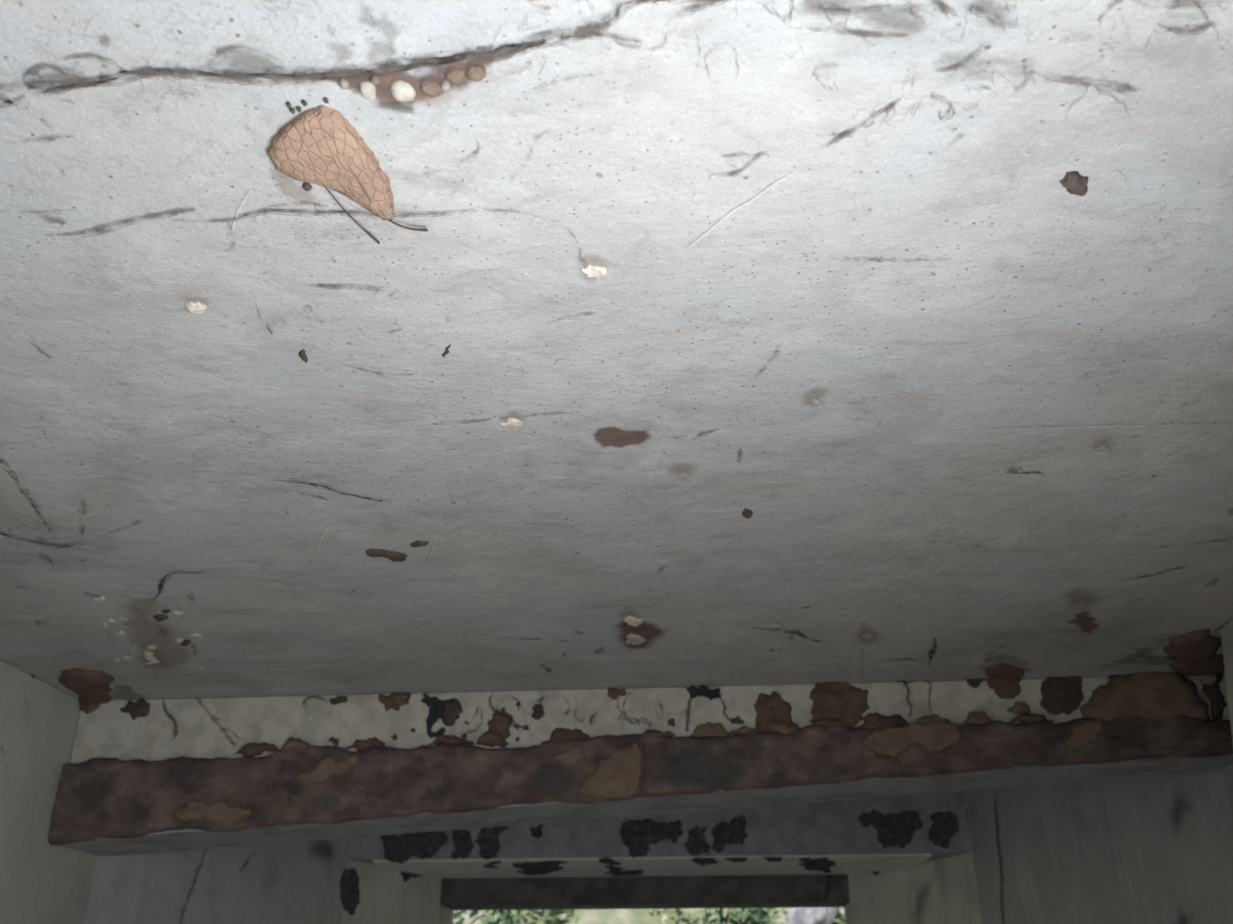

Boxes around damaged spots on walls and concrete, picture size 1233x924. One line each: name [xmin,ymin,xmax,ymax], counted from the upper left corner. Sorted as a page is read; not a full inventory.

rust [595,428,649,448]
spalling [620,616,661,649]
peeling [328,692,469,751]
spalling [487,702,544,742]
spalling [541,727,591,744]
spalling [667,682,870,737]
spalling [966,663,1084,715]
rust [48,714,1233,845]
peeling [380,824,568,882]
peeling [599,815,748,876]
peeling [857,810,959,849]
crack [995,801,1004,924]